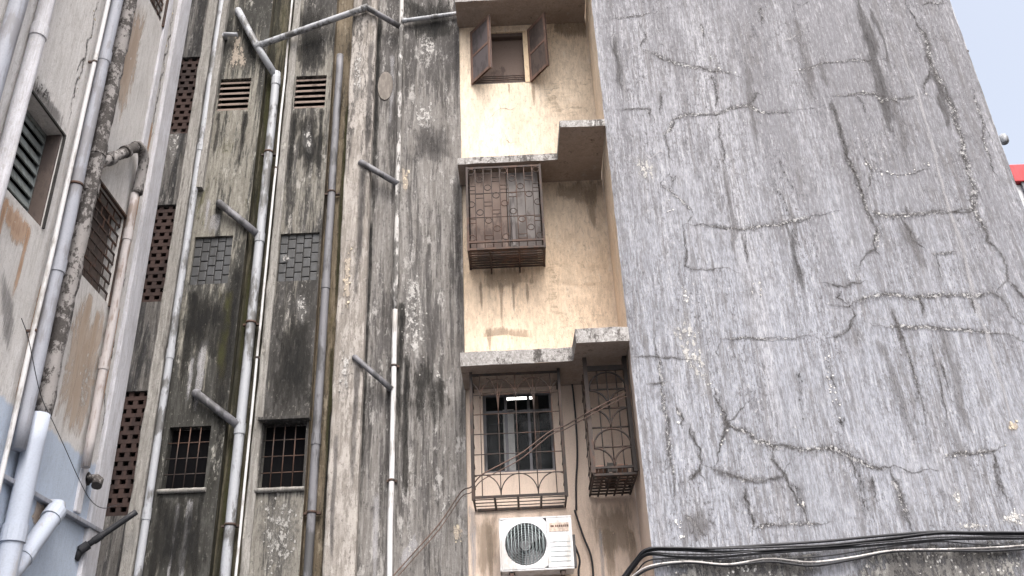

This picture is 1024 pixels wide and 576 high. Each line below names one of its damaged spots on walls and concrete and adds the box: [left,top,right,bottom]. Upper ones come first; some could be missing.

water stain [238,112,248,162]
water stain [287,108,324,188]
water stain [359,18,392,215]
water stain [405,1,458,79]
crack [611,14,786,158]
crack [662,176,833,270]
crack [824,1,1023,420]
water stain [180,265,243,566]
water stain [354,223,373,456]
crack [716,335,800,354]
crack [641,354,1006,529]
water stain [147,494,206,576]